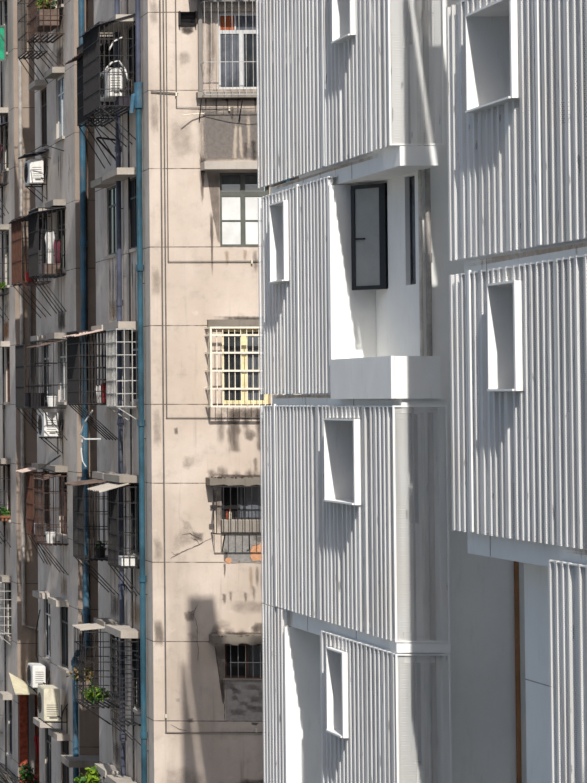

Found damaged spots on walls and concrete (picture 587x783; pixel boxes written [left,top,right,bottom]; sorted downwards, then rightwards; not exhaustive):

water stain [200,98,275,258]
water stain [229,410,280,450]
flaking render [224,535,271,564]
crack [189,608,225,718]